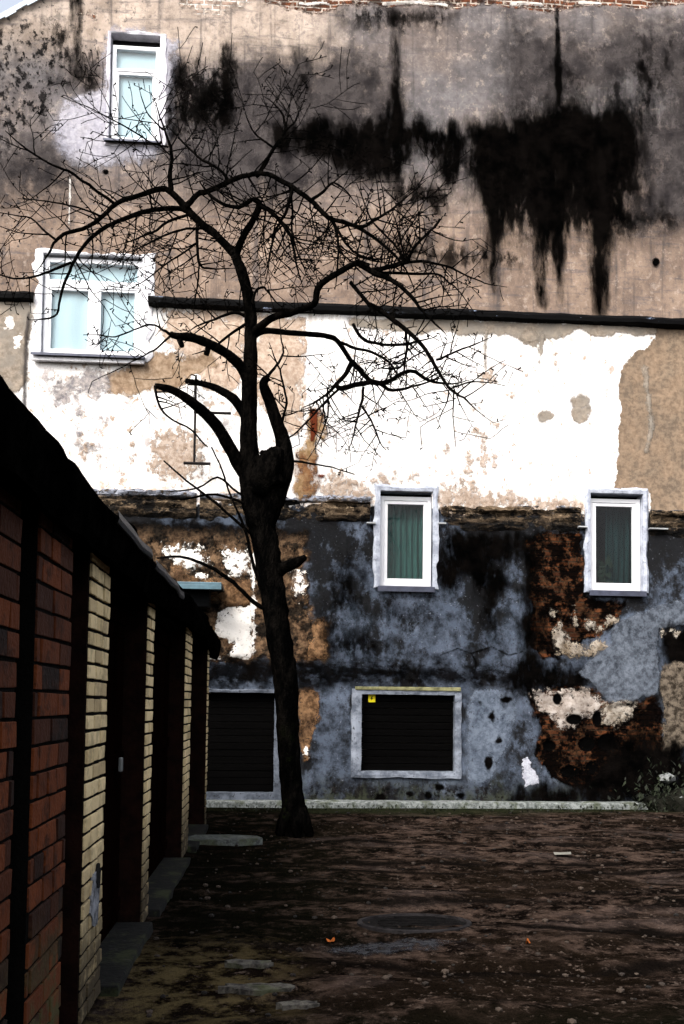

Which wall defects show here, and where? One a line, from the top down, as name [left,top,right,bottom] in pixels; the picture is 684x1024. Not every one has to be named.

damp [0,0,97,198]
damp [166,44,238,139]
damp [272,18,675,367]
peeling [45,309,308,462]
peeling [614,328,684,511]
spalling [131,519,271,664]
spalling [276,527,331,663]
damp [296,530,588,702]
spalling [526,531,626,661]
damp [660,624,684,666]
damp [307,729,684,802]
spalling [522,661,684,787]